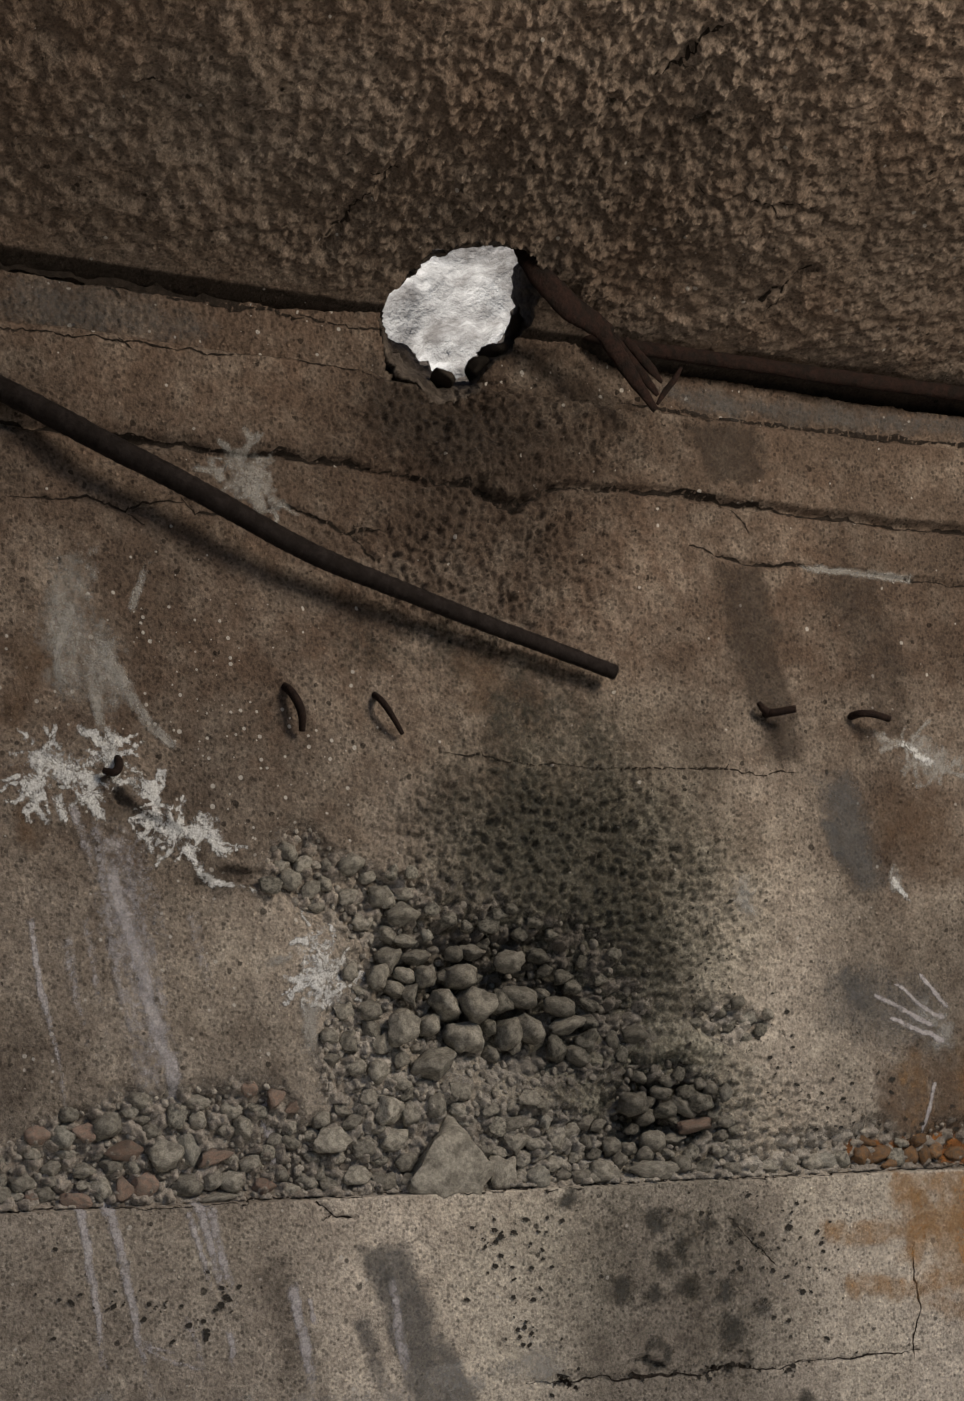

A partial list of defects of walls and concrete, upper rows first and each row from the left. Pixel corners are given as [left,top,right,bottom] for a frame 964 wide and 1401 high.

crack [0,420,59,433]
crack [621,403,964,448]
crack [6,492,217,525]
crack [113,432,964,588]
leakage [0,586,256,1099]
spalling [673,930,736,1019]
corrosion [873,1061,964,1164]
crack [526,1242,922,1390]